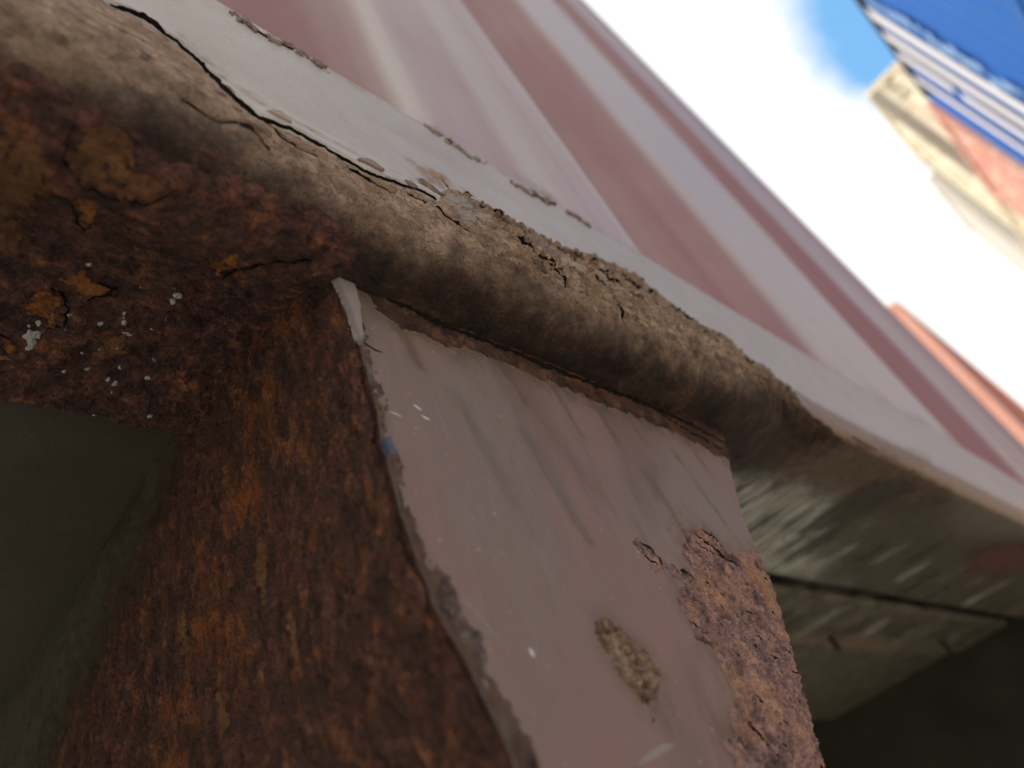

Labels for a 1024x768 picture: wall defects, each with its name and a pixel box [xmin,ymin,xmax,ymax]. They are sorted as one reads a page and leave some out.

peeling [229,11,328,73]
crack [110,3,495,231]
peeling [357,157,384,172]
peeling [424,123,489,164]
peeling [509,180,591,228]
crack [527,237,567,288]
corrosion [0,62,508,768]
corrosion [594,617,661,722]